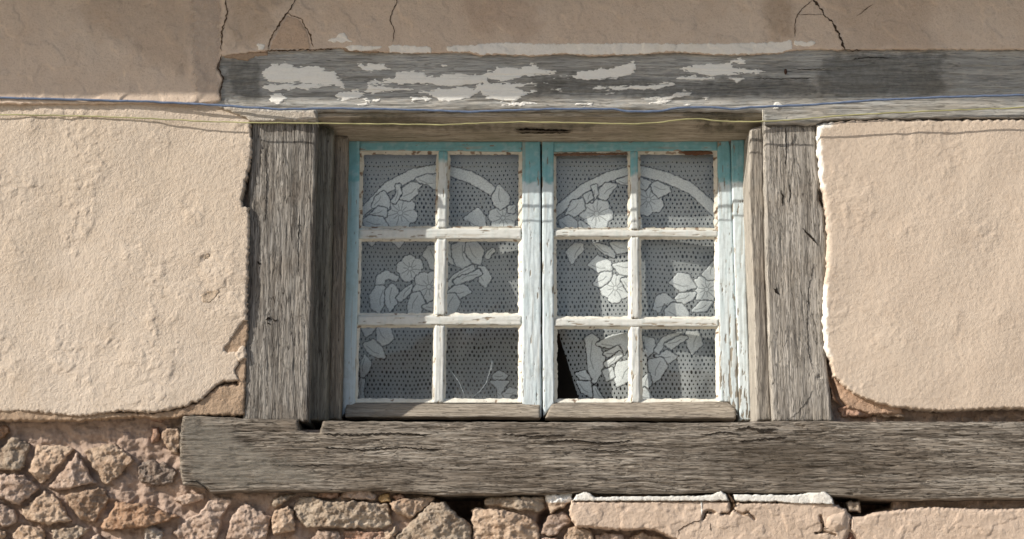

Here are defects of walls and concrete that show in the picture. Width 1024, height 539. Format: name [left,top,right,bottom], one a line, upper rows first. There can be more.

crack [265,0,332,52]
crack [794,0,873,52]
peeling [224,16,766,107]
spalling [0,319,249,423]
spalling [826,359,905,415]
crack [678,493,735,534]